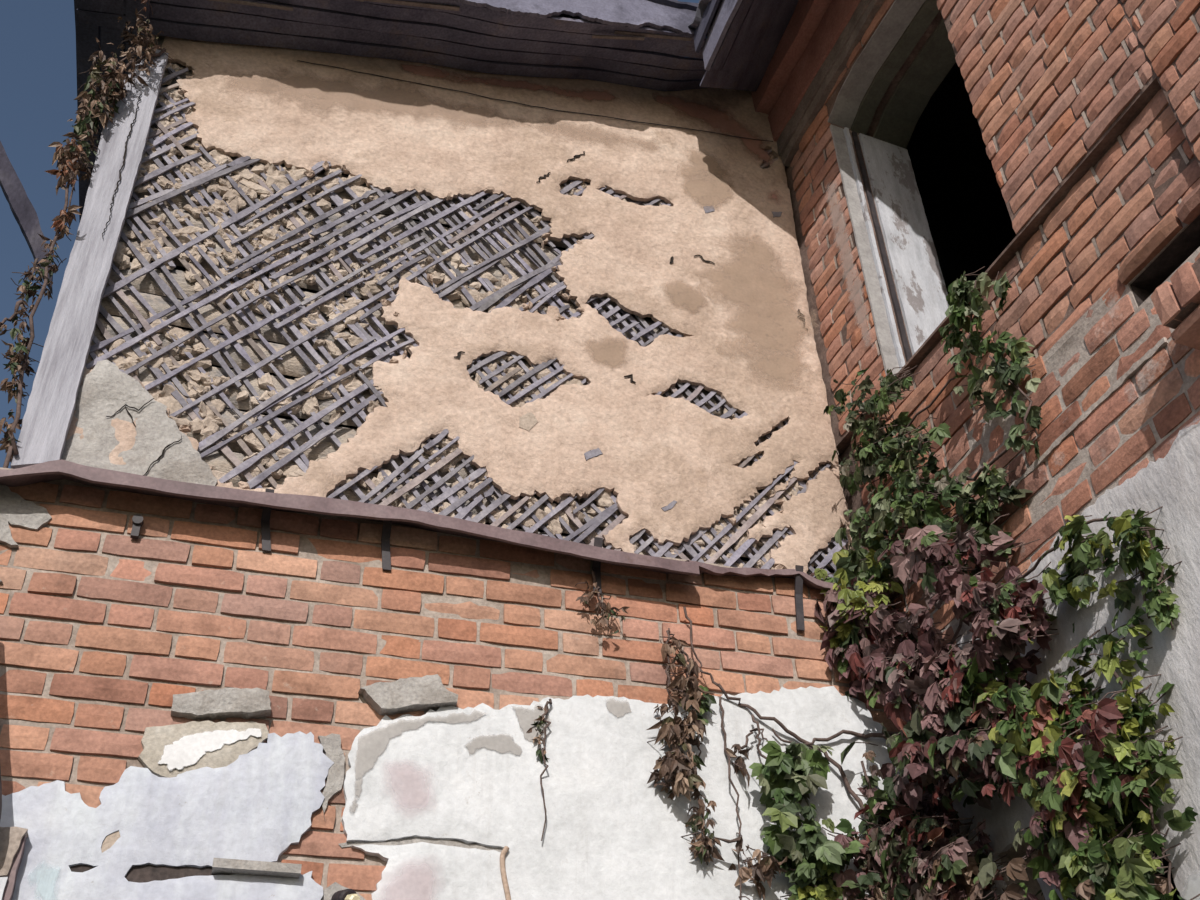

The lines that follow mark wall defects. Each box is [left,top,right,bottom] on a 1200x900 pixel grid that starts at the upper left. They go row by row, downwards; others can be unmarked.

damp [683,151,732,206]
damp [666,239,809,387]
damp [589,339,625,367]
crack [106,398,154,427]
crack [143,436,182,476]
peeling [956,632,980,649]
peeling [1020,421,1200,899]
peeling [0,686,899,900]
peeling [937,775,1035,900]